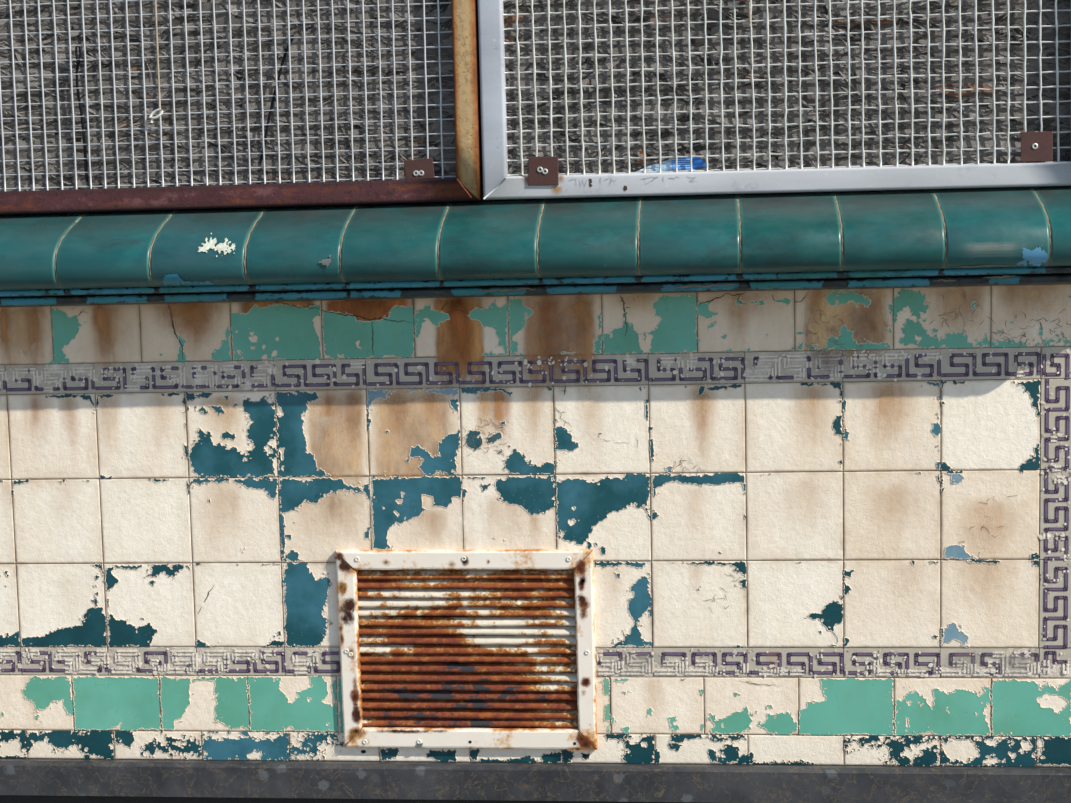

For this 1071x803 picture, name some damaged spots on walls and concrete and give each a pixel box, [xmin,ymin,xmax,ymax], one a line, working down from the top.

peeling [197,233,235,257]
crack [168,305,183,359]
rust [435,298,483,380]
rust [526,300,593,378]
peeling [0,245,1071,767]
rust [335,552,356,658]
rust [576,560,589,618]
rust [349,680,366,741]
rust [570,734,594,751]